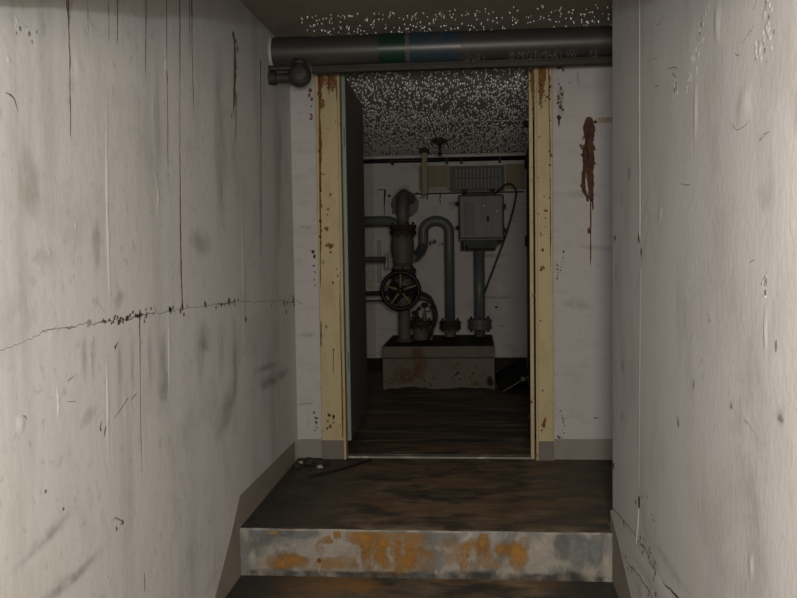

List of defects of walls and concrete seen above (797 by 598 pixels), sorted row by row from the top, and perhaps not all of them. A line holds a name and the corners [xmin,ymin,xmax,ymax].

rust [529,67,564,166]
rust [308,74,337,287]
rust [530,177,551,271]
rust [579,117,597,263]
crack [0,295,302,351]
rust [326,268,343,437]
rust [269,553,307,569]
rust [351,532,432,569]
rust [448,533,527,568]
crack [614,510,679,598]